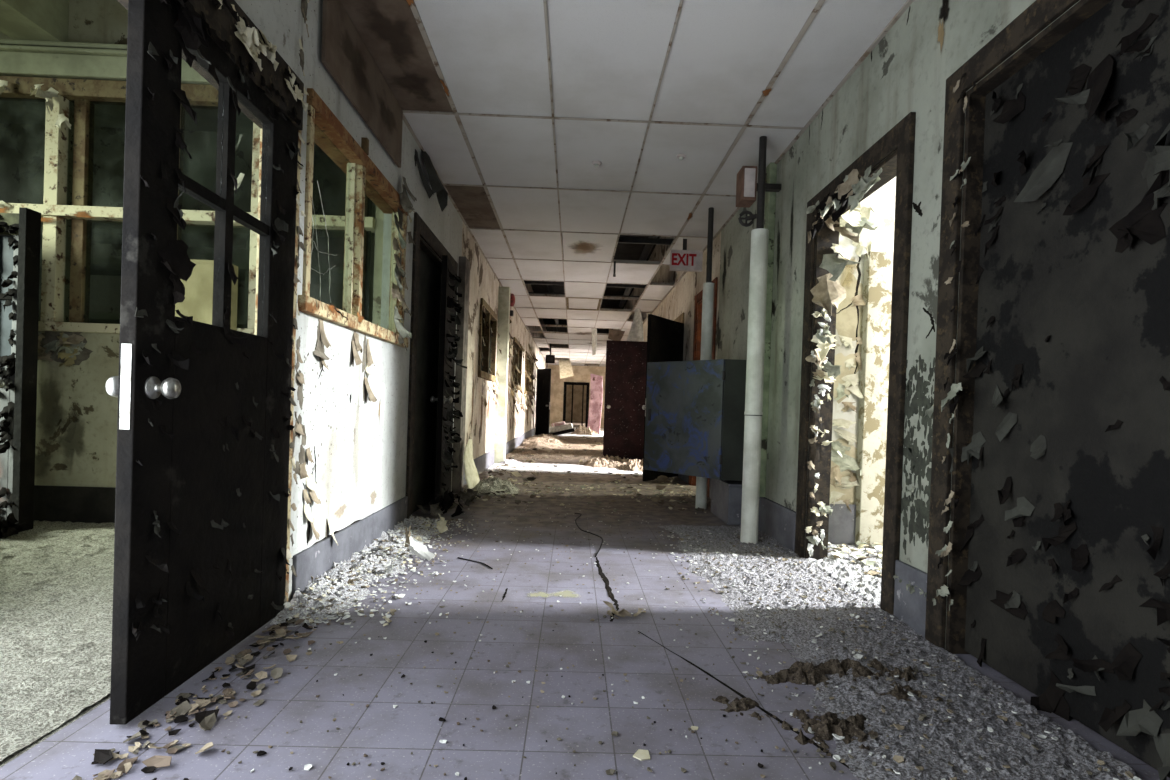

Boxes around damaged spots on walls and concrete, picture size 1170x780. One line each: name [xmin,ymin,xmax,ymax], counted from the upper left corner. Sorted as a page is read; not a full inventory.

peeling [30,84,71,129]
peeling [953,73,977,113]
damp [572,243,596,253]
peeling [945,241,962,285]
peeling [142,0,377,611]
rust [318,302,364,324]
peeling [38,331,93,367]
peeling [805,166,882,559]
spalling [893,339,1024,611]